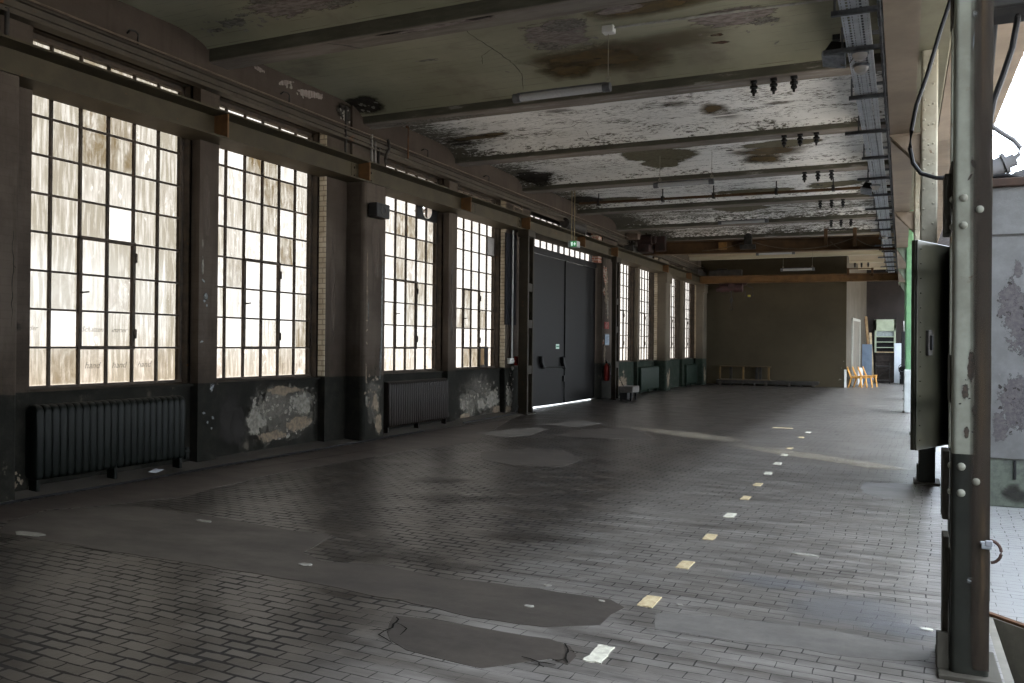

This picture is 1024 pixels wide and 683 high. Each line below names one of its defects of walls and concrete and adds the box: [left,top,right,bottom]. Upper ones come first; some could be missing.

water stain [534,32,700,78]
peeling [621,147,698,169]
peeling [808,180,865,189]
peeling [996,259,1024,358]
peeling [244,383,318,446]
peeling [364,364,382,434]
peeling [456,366,514,418]
peeling [993,373,1024,441]
crack [371,617,407,643]
crack [522,643,574,667]